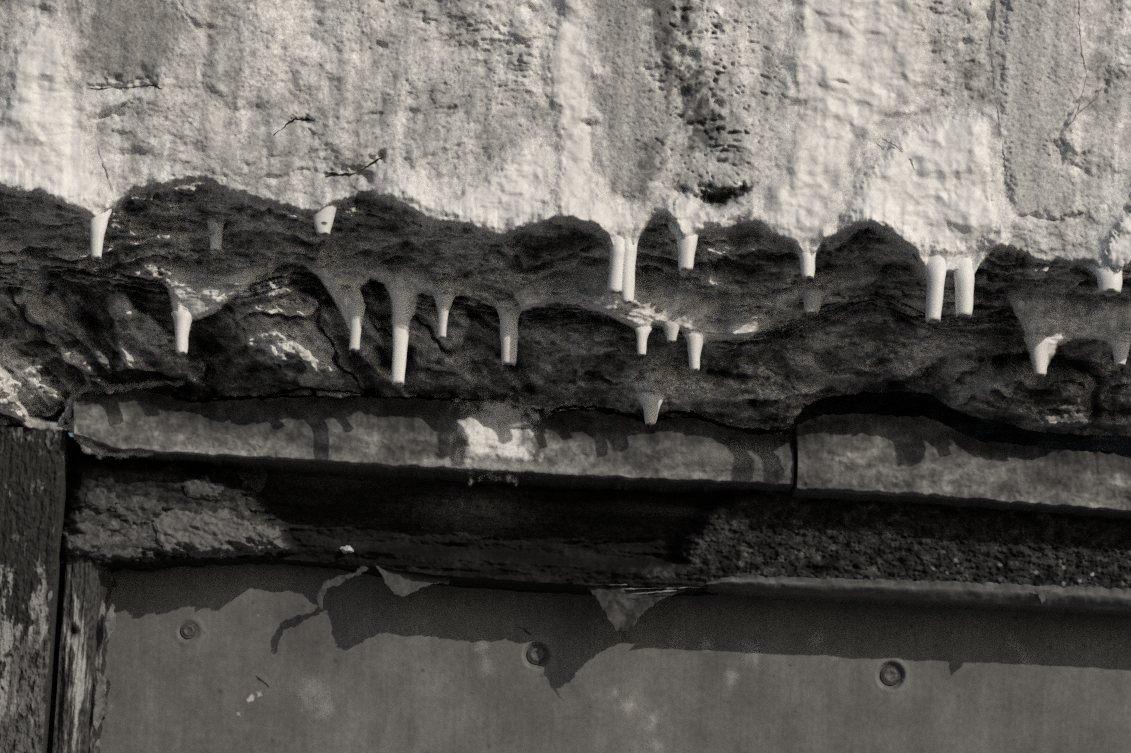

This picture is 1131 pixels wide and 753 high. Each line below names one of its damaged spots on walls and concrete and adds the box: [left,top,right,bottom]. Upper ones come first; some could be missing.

crack [274,118,320,135]
water stain [643,0,720,152]
crack [990,0,1011,206]
crack [323,157,383,177]
water stain [668,189,736,239]
water stain [1104,201,1131,272]
crack [190,387,375,400]
peeling [61,475,286,559]